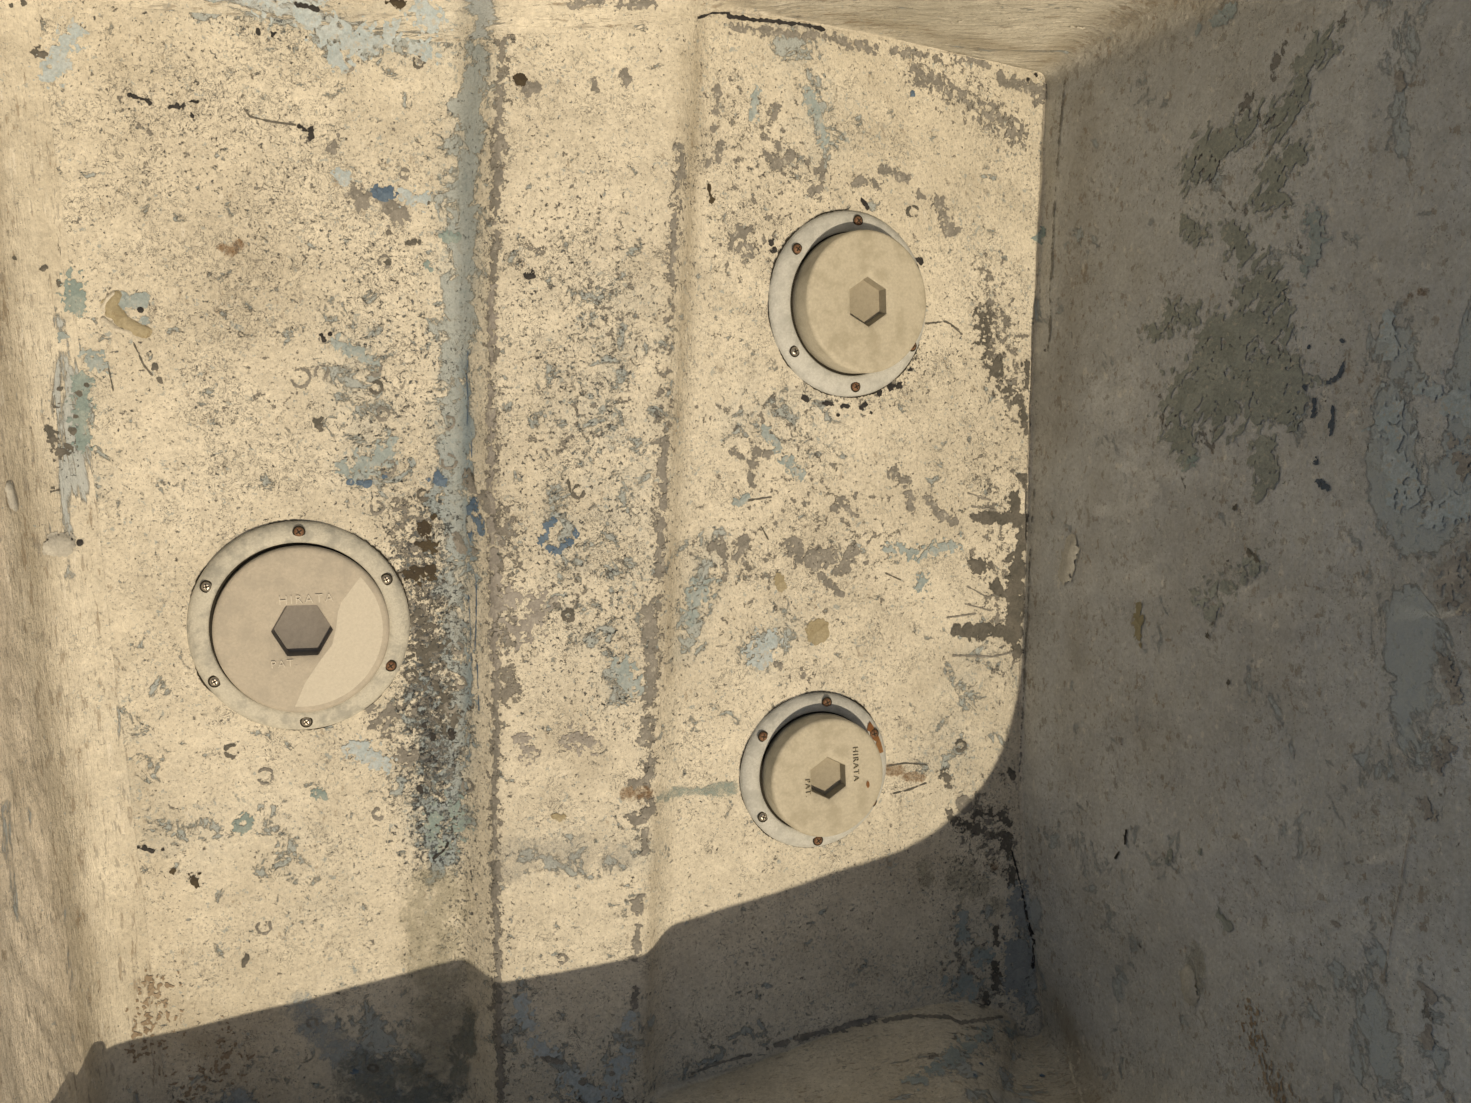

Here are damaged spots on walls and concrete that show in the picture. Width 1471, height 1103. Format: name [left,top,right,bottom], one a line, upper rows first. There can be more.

peeling [211,0,453,74]
crack [698,12,826,32]
peeling [297,123,462,272]
peeling [1136,20,1345,510]
peeling [319,332,381,371]
peeling [312,416,324,432]
peeling [327,433,403,488]
peeling [1361,369,1471,535]
rust [867,722,926,782]
peeling [630,894,646,962]
peeling [630,985,640,1012]